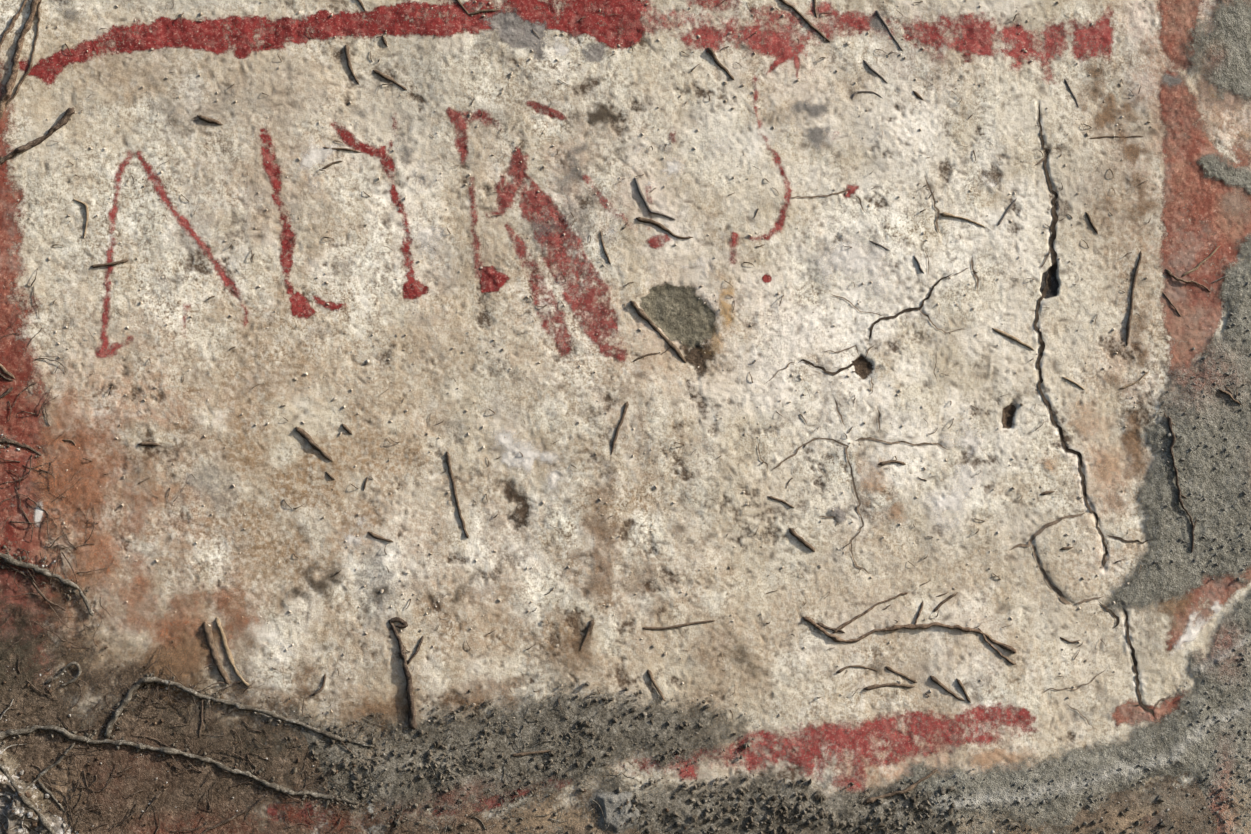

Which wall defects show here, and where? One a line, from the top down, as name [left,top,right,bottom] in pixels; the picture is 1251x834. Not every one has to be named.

flaking render [640,283,716,378]
crack [758,177,979,574]
crack [1011,104,1174,725]